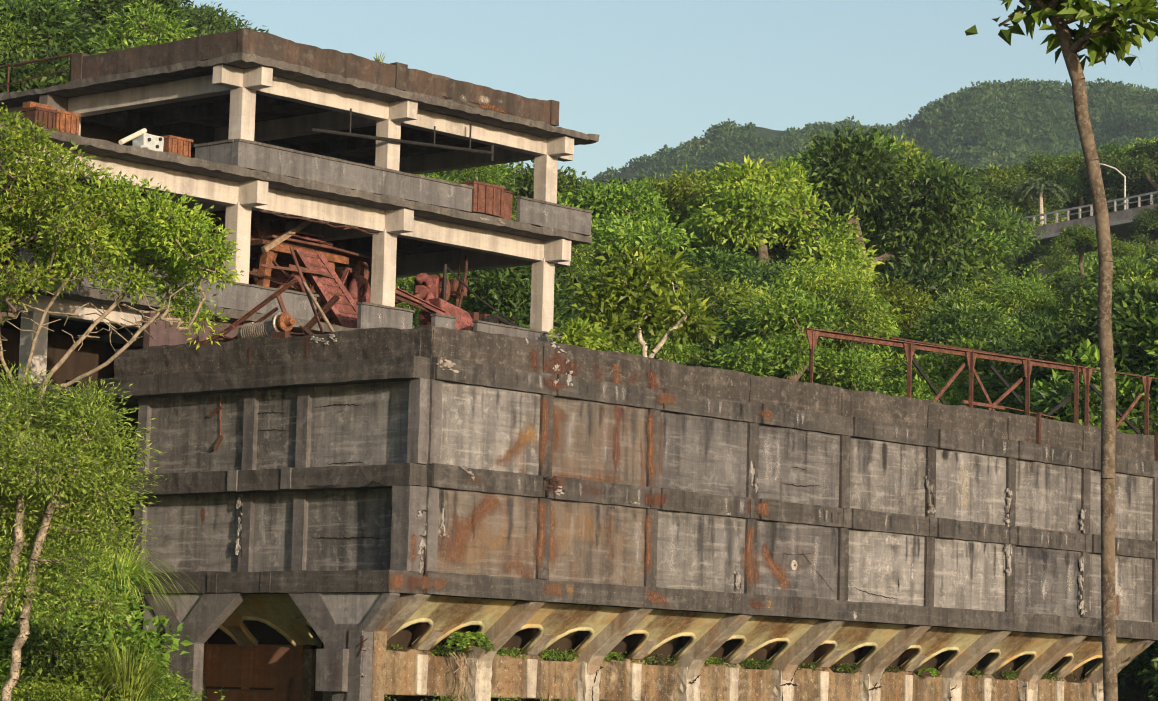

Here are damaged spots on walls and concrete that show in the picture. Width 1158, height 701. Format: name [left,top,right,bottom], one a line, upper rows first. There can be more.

spalling [550,342,573,386]
corrosion [500,350,574,463]
spalling [416,502,449,575]
corrosion [438,497,499,561]
corrosion [536,474,602,566]
corrosion [641,414,666,570]
spalling [750,461,759,494]
corrosion [744,528,786,588]
leakage [864,443,887,472]
leakage [943,451,997,506]
spalling [1003,544,1012,576]
spalling [1078,555,1087,616]